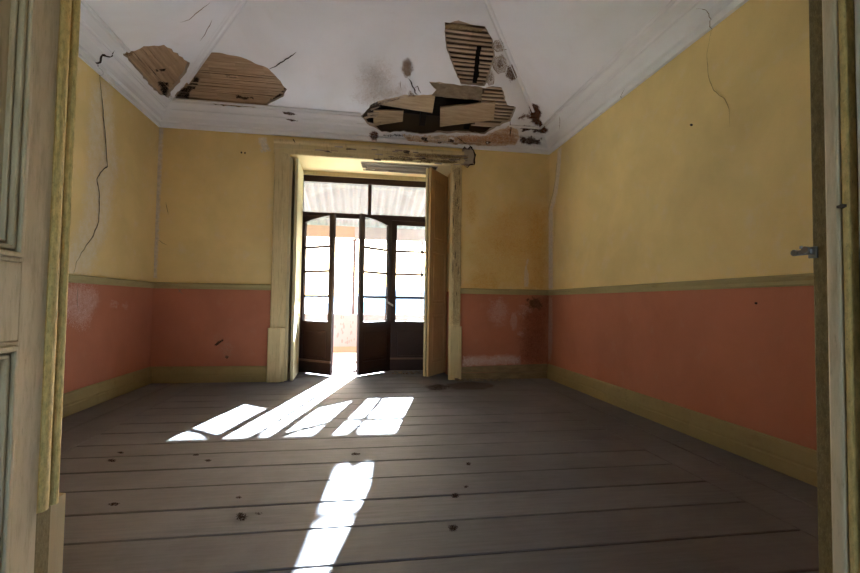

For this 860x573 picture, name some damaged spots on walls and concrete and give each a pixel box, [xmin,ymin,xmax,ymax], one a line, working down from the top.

crack [73,52,114,310]
flaking render [123,45,287,108]
flaking render [315,20,519,324]